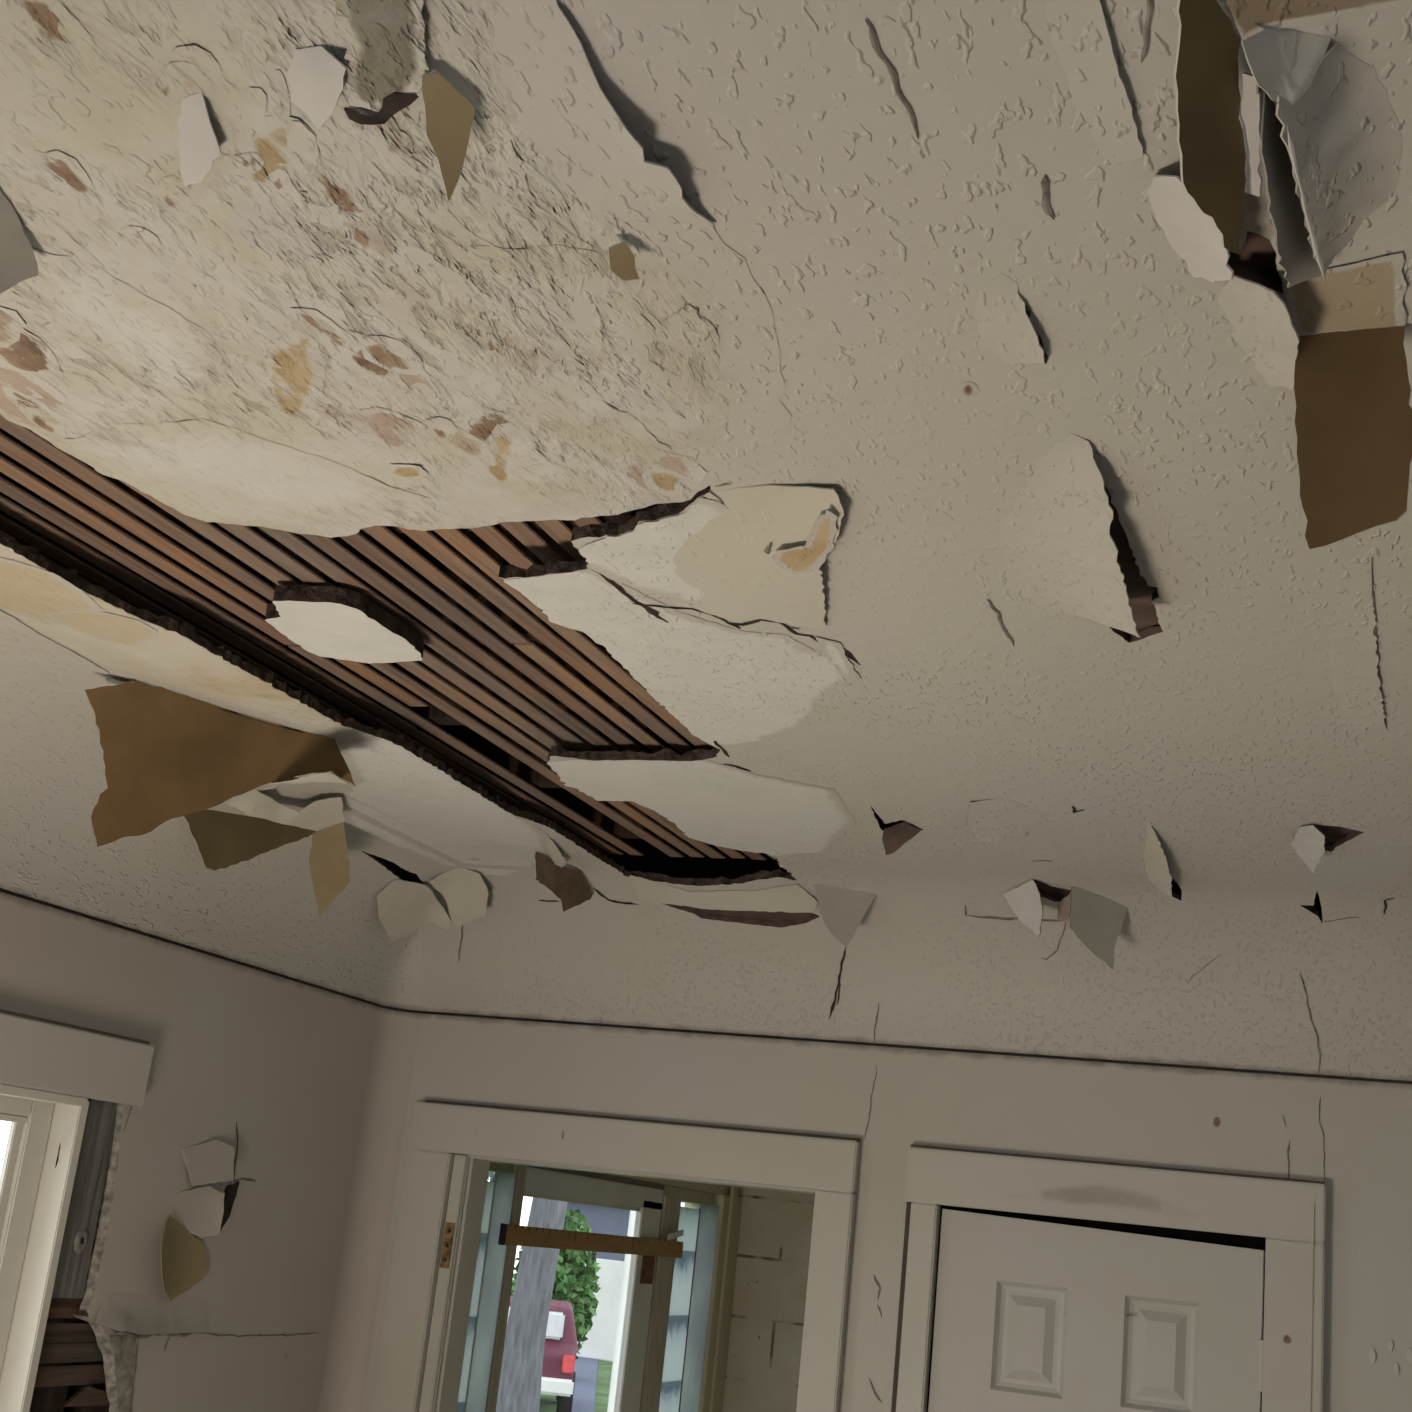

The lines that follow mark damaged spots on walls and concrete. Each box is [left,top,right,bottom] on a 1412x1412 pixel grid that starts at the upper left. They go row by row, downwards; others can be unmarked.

crack [865,19,919,139]
peeling [1148,0,1412,550]
peeling [998,433,1163,643]
peeling [0,484,877,947]
crack [1371,557,1387,730]
crack [829,947,846,1019]
peeling [1003,879,1127,970]
peeling [1291,824,1364,873]
crack [864,1003,879,1140]
spalling [72,1103,137,1412]
crack [95,1292,316,1351]
peeling [161,1122,257,1301]